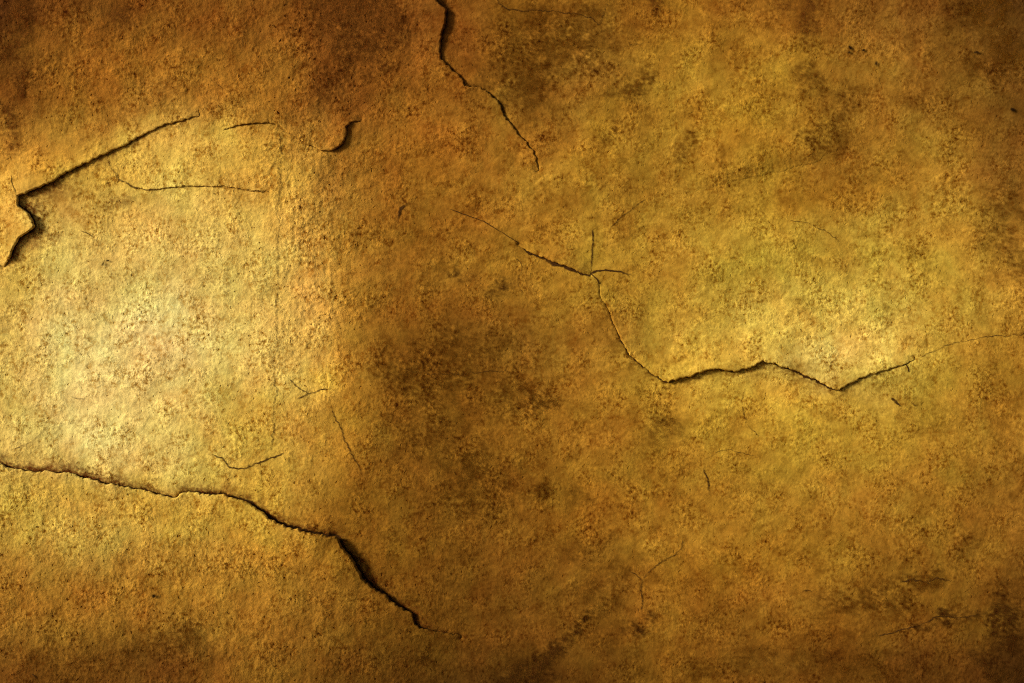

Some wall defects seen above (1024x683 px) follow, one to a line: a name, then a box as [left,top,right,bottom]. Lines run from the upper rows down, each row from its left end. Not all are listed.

crack [396,0,539,171]
crack [453,201,642,291]